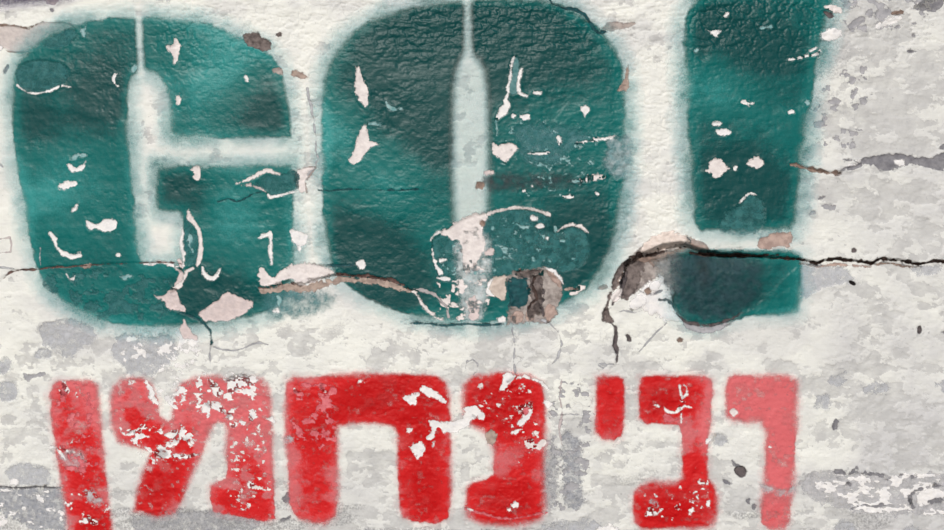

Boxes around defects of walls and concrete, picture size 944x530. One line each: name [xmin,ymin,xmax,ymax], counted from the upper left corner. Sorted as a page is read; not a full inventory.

crack [549,0,606,34]
peeling [348,121,381,164]
peeling [430,57,631,325]
crack [790,159,862,176]
crack [0,237,181,278]
peeling [34,209,276,530]
peeling [199,291,330,322]
crack [257,260,516,372]
crack [598,259,666,369]
spalling [611,192,793,342]
crack [776,256,944,268]
flaking render [403,372,601,530]